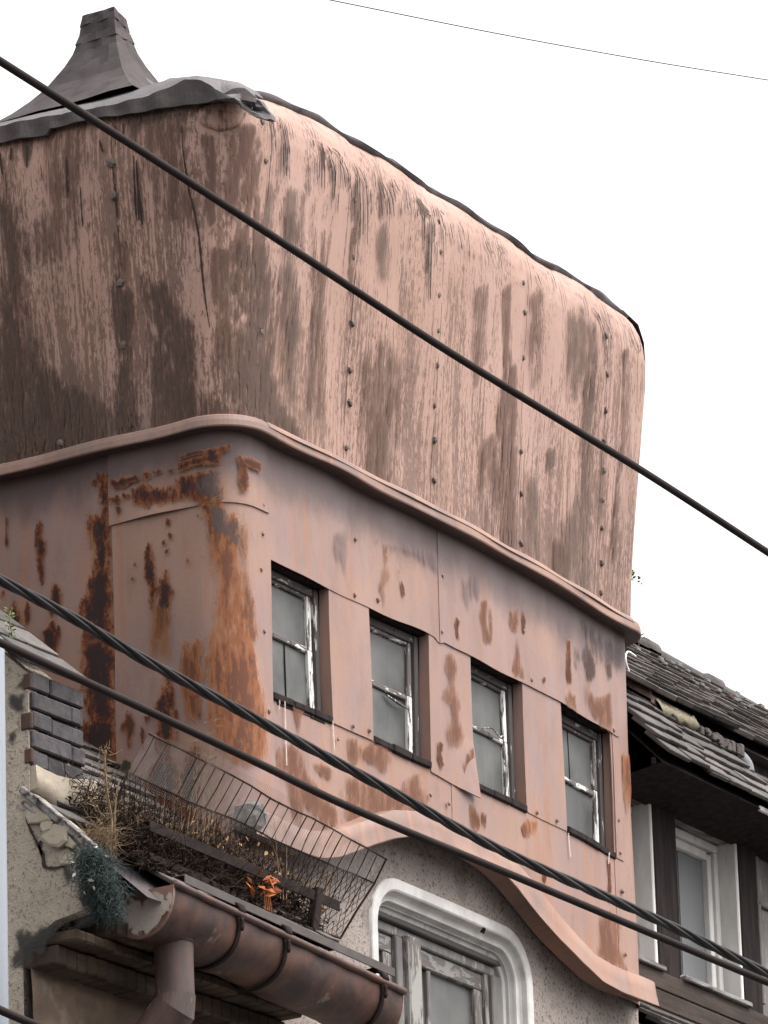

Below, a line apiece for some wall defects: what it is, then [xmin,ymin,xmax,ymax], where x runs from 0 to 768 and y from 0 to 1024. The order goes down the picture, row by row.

leakage [0,103,328,464]
crack [181,125,210,327]
leakage [349,181,360,295]
leakage [373,156,392,282]
leakage [361,340,403,485]
leakage [480,282,608,591]
rust [34,521,62,652]
rust [79,445,427,826]
rust [438,654,474,773]
rust [566,640,612,728]
rust [623,754,631,813]
peeling [118,891,173,935]